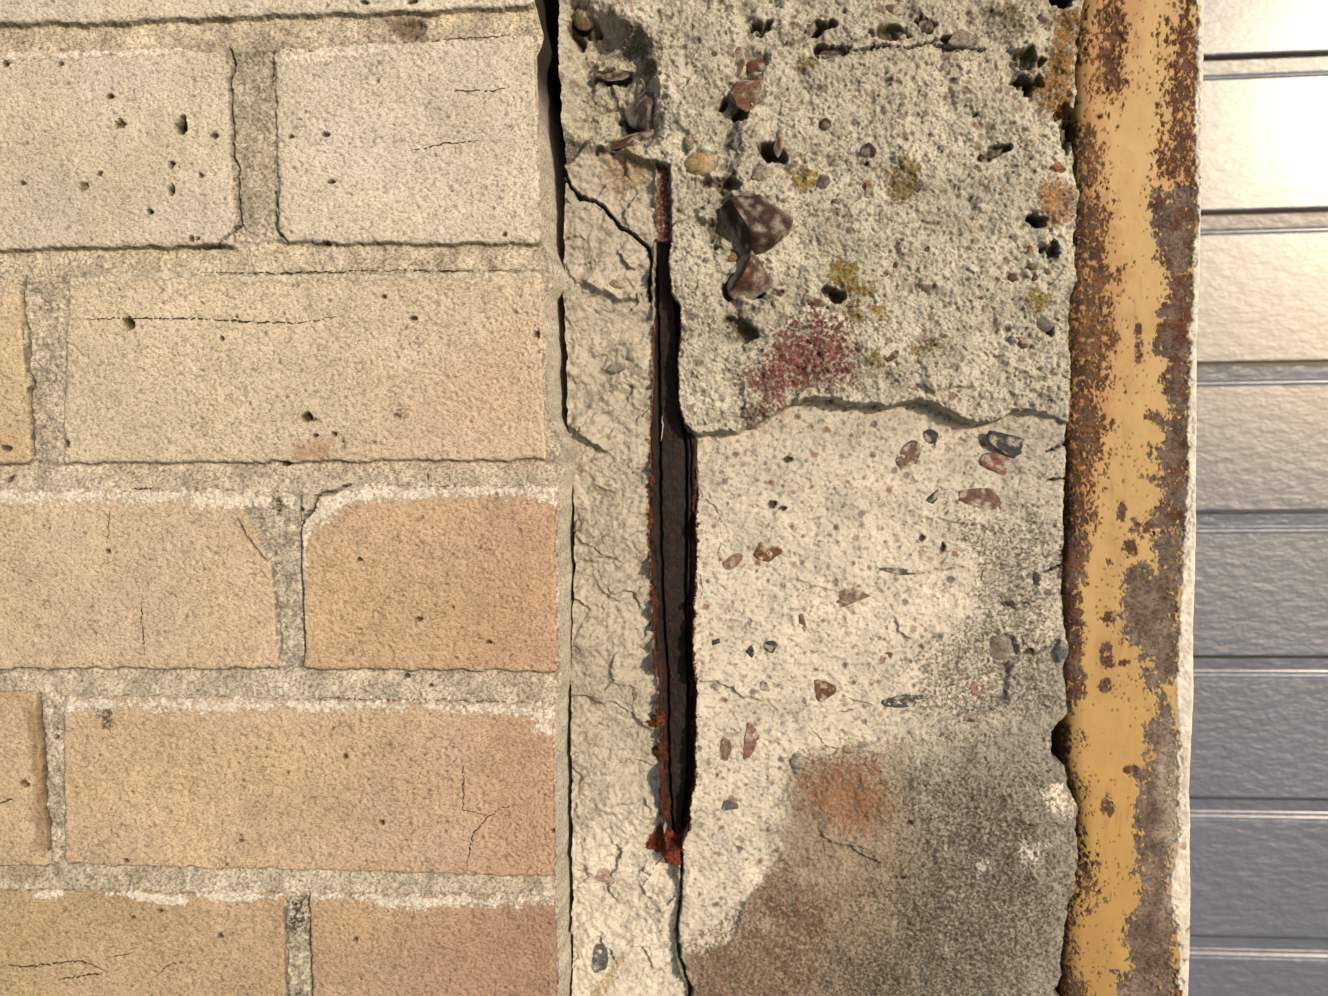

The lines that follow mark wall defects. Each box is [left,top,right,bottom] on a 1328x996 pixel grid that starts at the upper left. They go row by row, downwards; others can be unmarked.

rust [1025,0,1081,123]
crack [565,168,653,301]
rust [600,145,676,245]
rust [1033,176,1078,229]
spalling [558,0,1201,996]
rust [645,326,701,866]
damp [684,498,1078,996]
damp [591,955,625,996]
crack [641,858,692,996]